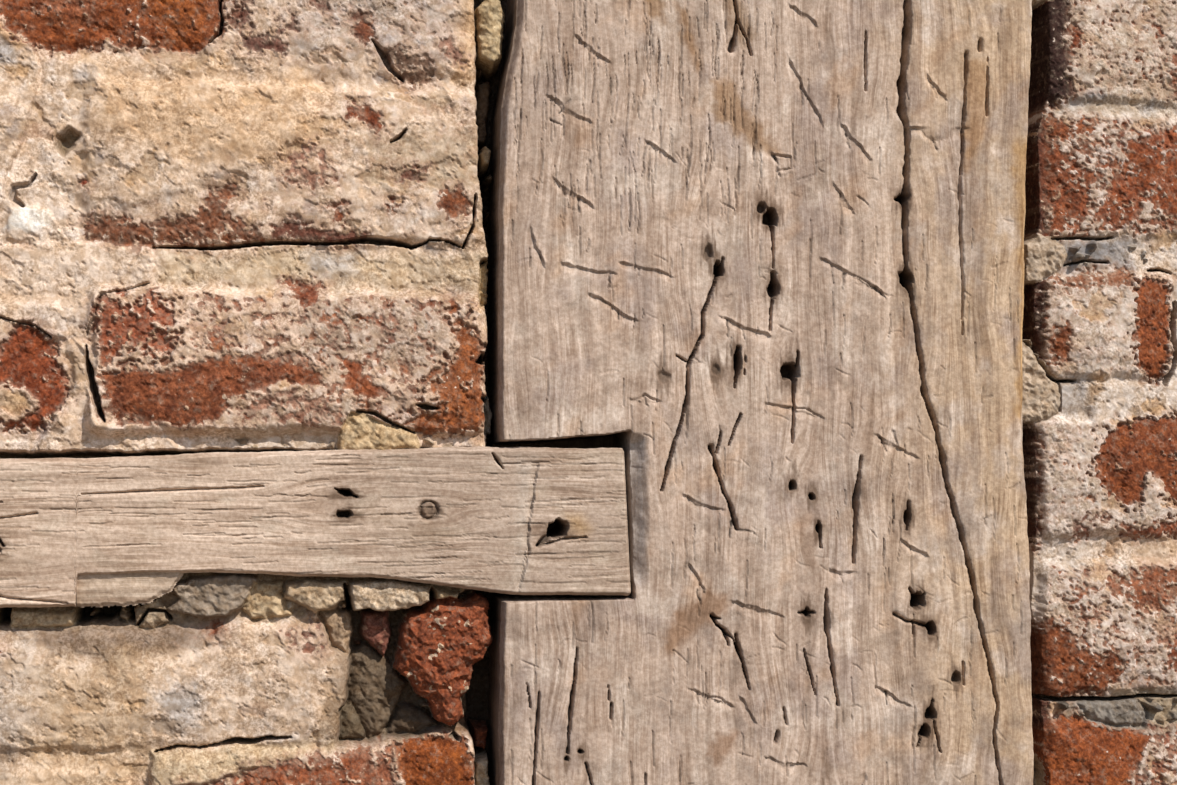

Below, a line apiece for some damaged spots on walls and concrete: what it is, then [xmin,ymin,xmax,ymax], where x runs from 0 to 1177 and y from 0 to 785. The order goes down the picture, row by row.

crack [213,0,224,41]
crack [373,41,405,82]
crack [341,196,477,250]
crack [160,242,303,251]
crack [1052,236,1114,267]
crack [0,317,52,339]
crack [87,283,150,422]
crack [1022,340,1077,412]
spalling [190,589,493,785]
crack [154,735,292,754]